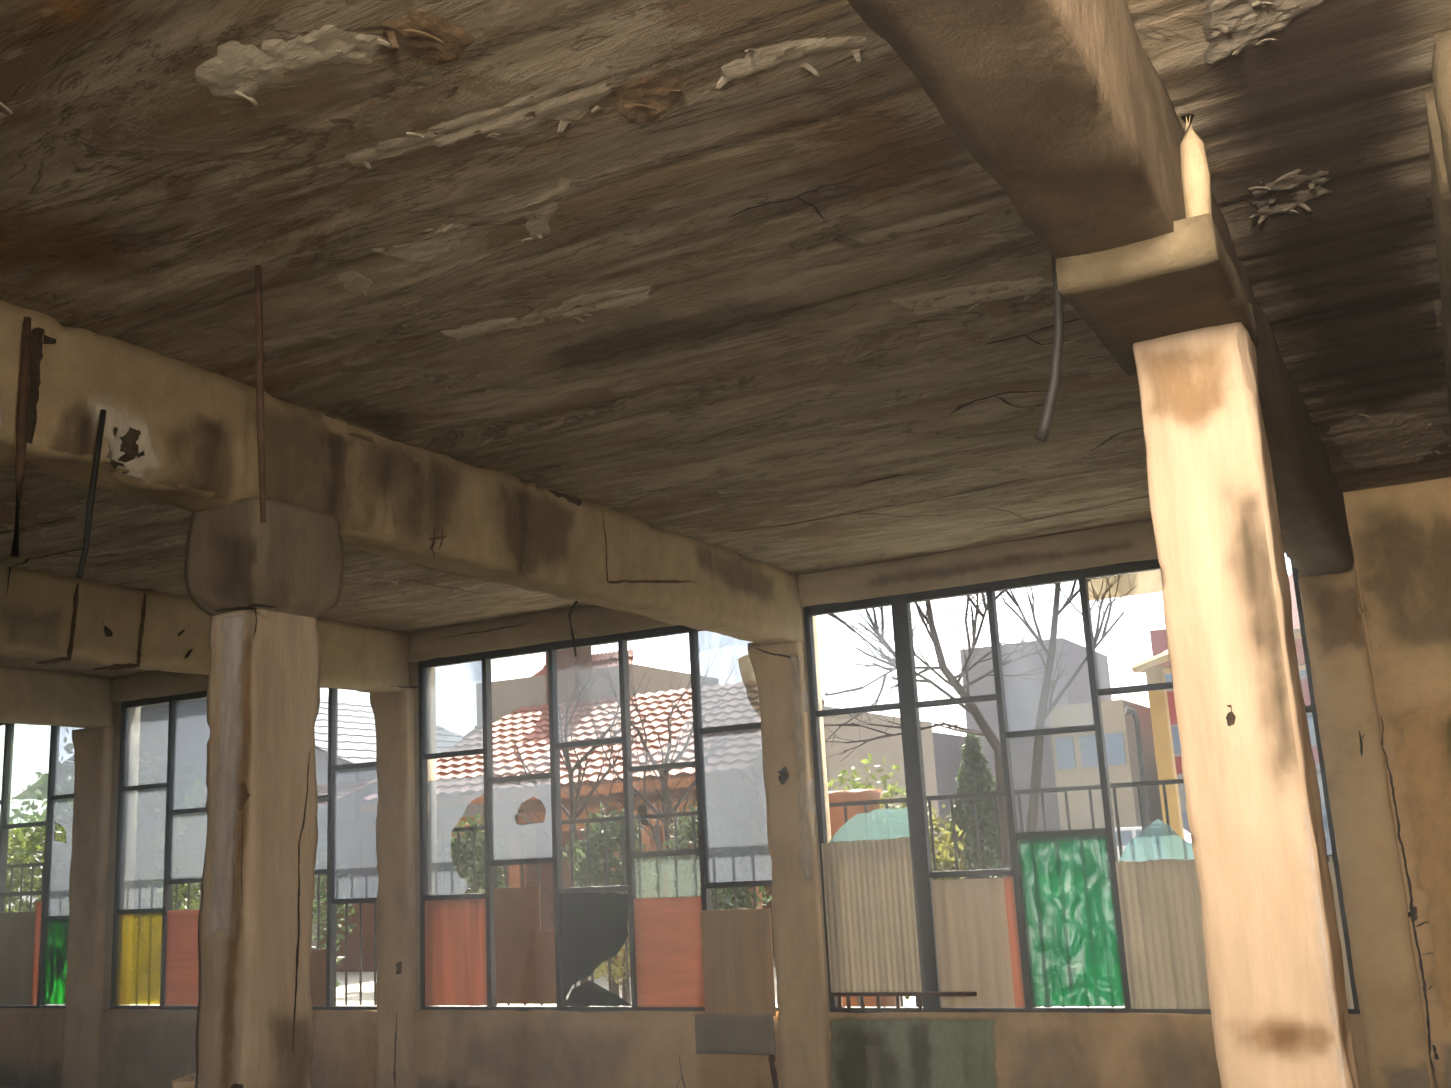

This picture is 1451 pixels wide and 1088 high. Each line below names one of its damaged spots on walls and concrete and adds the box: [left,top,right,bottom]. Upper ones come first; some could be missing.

peeling [195,10,475,106]
water stain [838,1026,930,1088]
crack [1359,717,1439,1088]
water stain [1398,704,1451,1015]